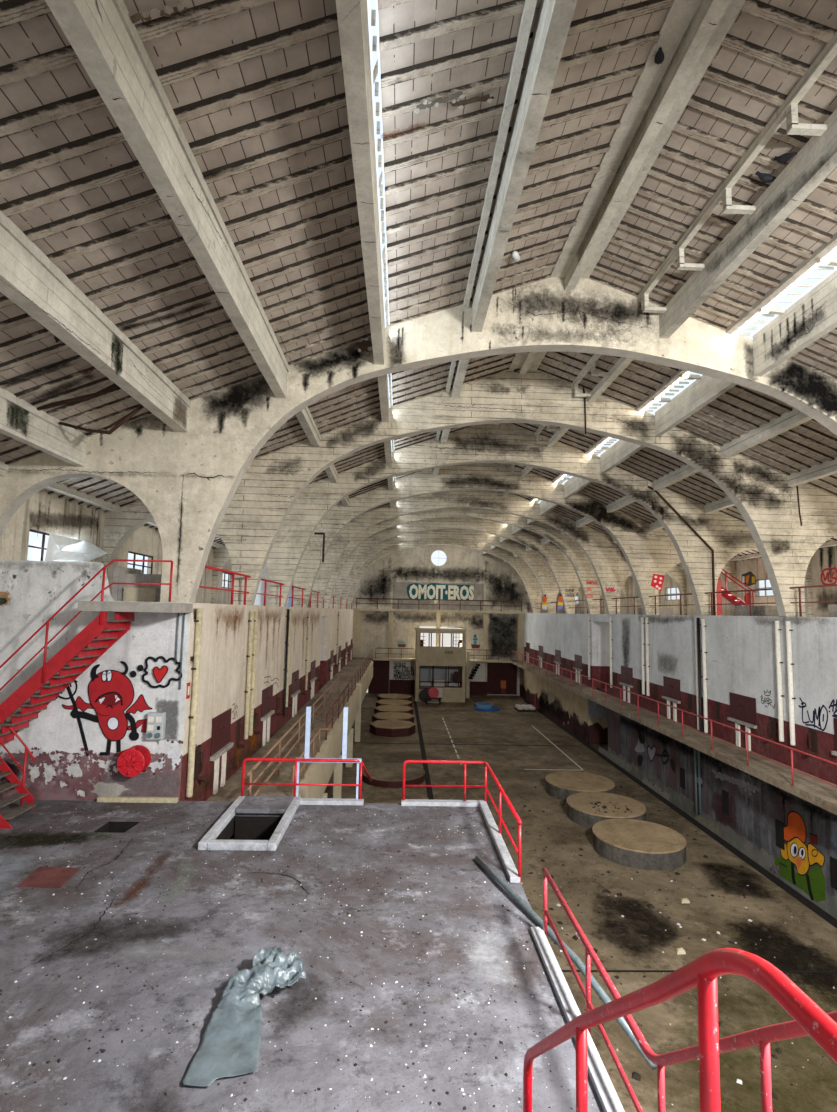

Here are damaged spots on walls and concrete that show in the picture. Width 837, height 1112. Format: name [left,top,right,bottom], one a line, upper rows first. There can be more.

leakage [513,288,651,339]
leakage [746,299,837,416]
mould [205,375,270,433]
peeling [27,747,119,800]
peeling [148,739,201,781]
crack [60,830,140,898]
rust [116,858,166,905]
crack [7,899,115,976]
leakage [598,897,678,955]
leakage [735,924,837,990]